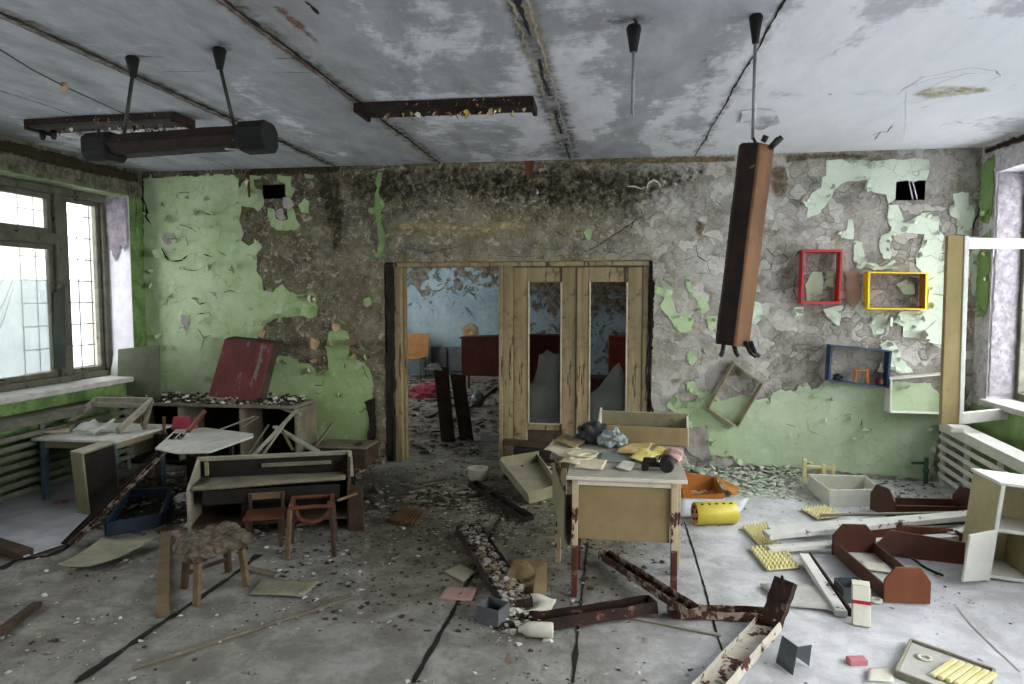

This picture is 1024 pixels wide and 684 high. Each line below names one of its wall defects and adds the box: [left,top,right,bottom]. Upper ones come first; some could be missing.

crack [131,187,236,349]
peeling [142,173,335,397]
peeling [263,171,396,462]
water stain [250,156,734,250]
crack [584,215,643,253]
crack [645,265,655,412]
peeling [647,261,717,412]
crack [766,246,799,299]
peeling [667,154,1024,481]
water stain [899,67,1001,103]
water stain [976,134,1024,166]